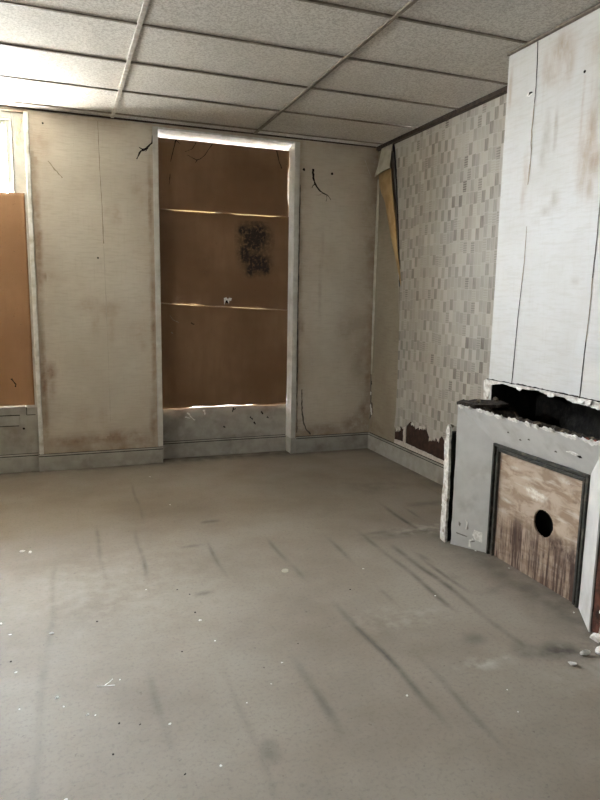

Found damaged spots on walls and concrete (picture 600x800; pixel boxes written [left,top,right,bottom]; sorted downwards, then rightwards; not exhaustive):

crack [136,138,153,159]
crack [169,140,213,183]
water stain [234,220,275,279]
crack [296,169,331,434]
flaking render [458,379,600,446]
flaking render [411,422,482,548]